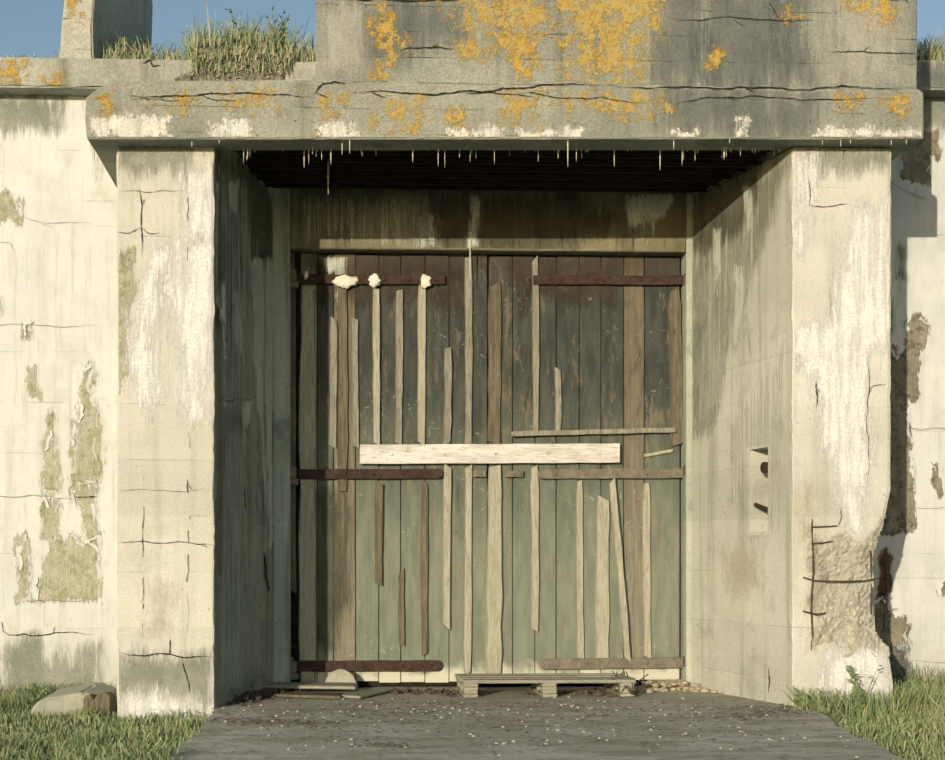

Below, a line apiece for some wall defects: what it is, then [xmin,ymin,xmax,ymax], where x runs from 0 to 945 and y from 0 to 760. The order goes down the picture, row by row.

crack [394,0,453,8]
crack [670,2,816,26]
crack [125,81,922,103]
peeling [897,128,943,187]
crack [0,493,95,501]
peeling [13,361,107,605]
spalling [803,312,945,657]
crack [120,472,213,694]
rust [876,547,893,599]
crack [2,626,92,636]